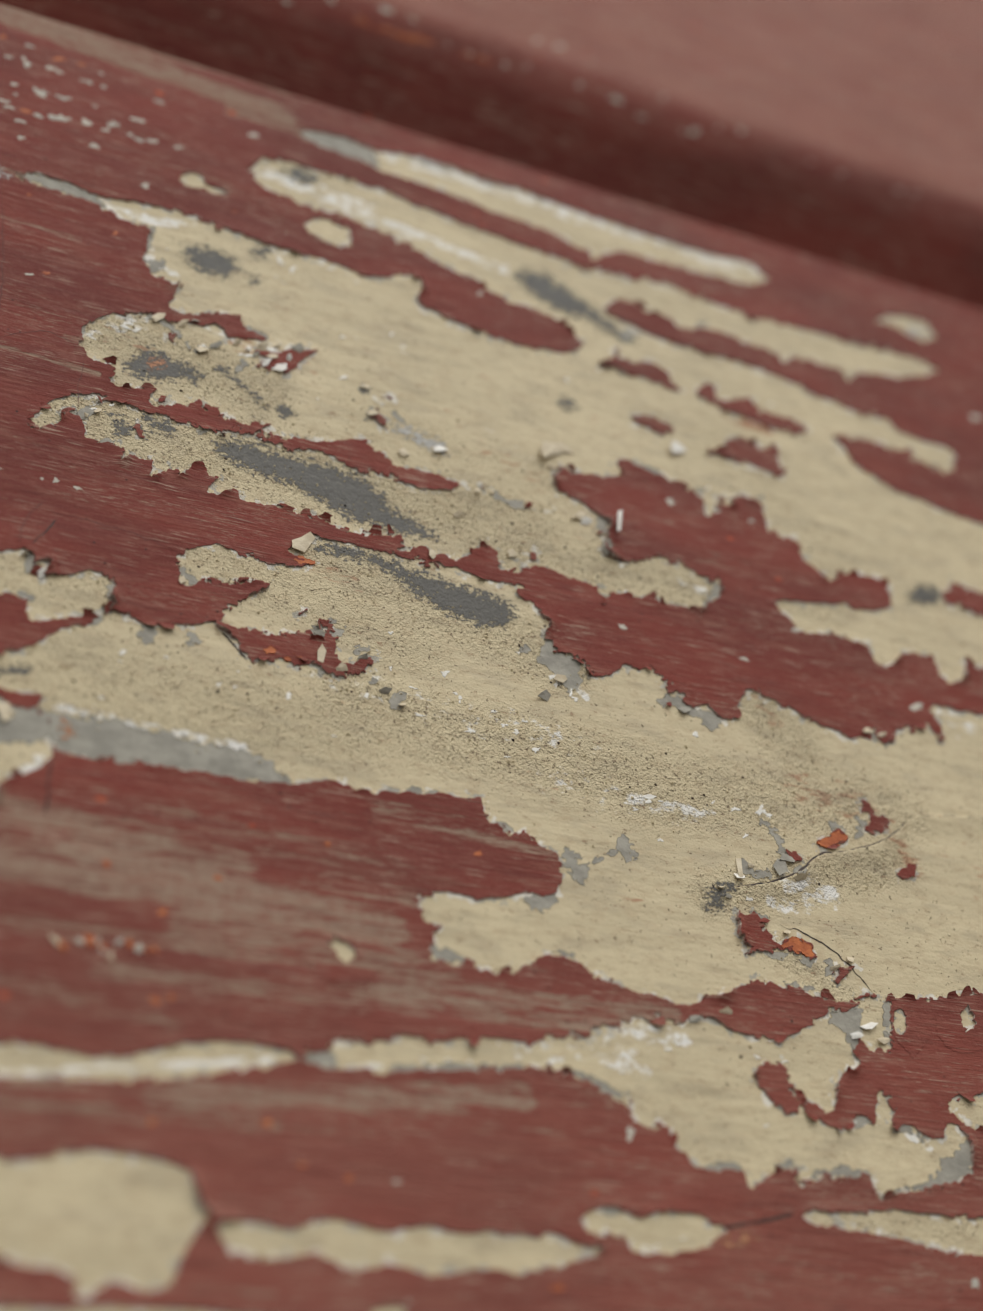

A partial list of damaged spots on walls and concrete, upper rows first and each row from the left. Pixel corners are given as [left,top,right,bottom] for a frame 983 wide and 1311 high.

peeling [0,113,983,697]
peeling [0,372,983,1311]